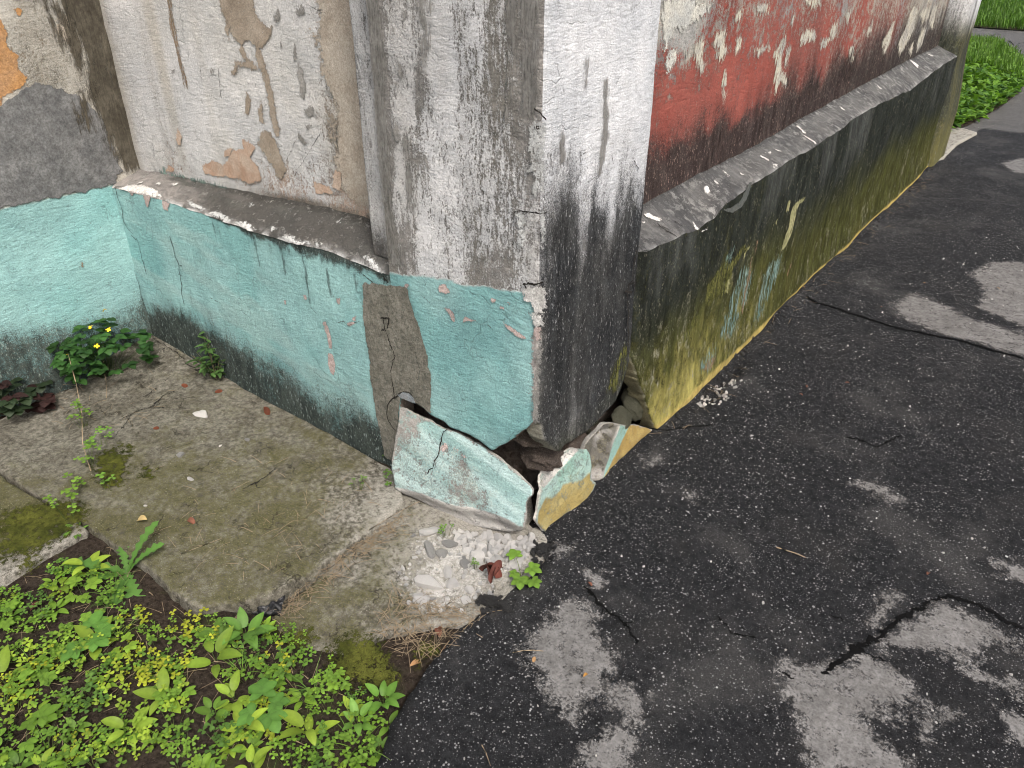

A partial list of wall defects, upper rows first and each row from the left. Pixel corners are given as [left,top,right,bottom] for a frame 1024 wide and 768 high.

peeling [659,0,770,104]
peeling [753,9,851,95]
peeling [866,0,938,68]
peeling [119,0,370,217]
leakage [1001,158,1024,173]
flaking render [187,200,257,231]
flaking render [271,226,323,247]
leakage [773,198,805,251]
leakage [705,244,751,306]
leakage [889,260,1024,355]
crack [311,308,420,430]
crack [427,429,447,474]